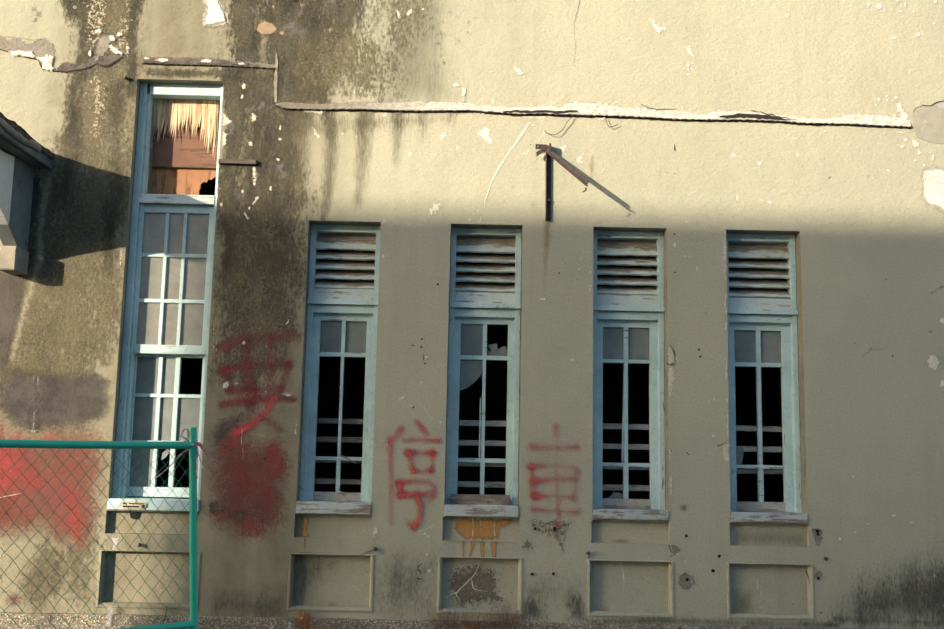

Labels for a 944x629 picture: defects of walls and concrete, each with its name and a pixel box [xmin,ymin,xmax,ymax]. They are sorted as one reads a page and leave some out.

spalling [0,29,130,78]
peeling [191,0,231,28]
damp [0,0,424,416]
crack [142,53,944,222]
peeling [897,132,944,218]
crack [445,565,481,599]